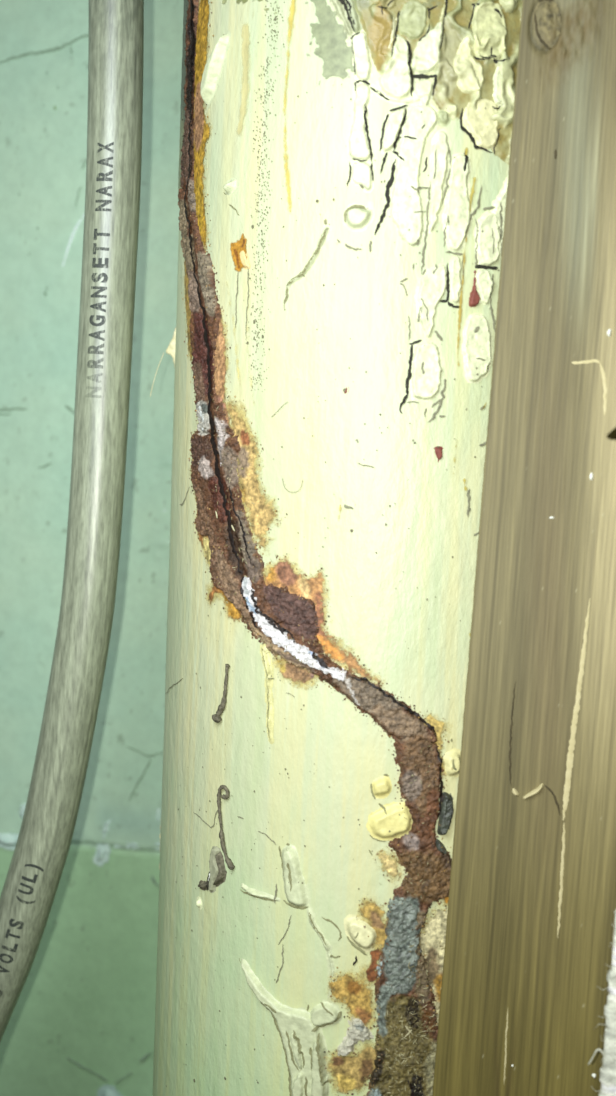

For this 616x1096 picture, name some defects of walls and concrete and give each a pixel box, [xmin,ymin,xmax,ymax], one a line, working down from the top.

rust [237,25,249,134]
rust [284,0,295,111]
crack [337,0,506,422]
peeling [329,0,522,402]
rust [230,234,250,335]
rust [457,238,467,348]
crack [178,0,454,1096]
crack [467,489,479,536]